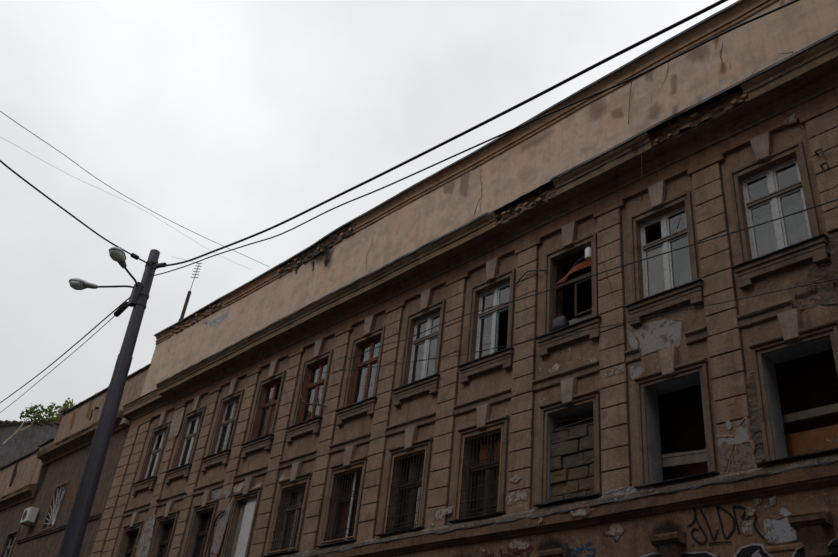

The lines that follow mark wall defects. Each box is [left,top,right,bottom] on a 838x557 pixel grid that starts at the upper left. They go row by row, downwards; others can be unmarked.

peeling [604,317,685,382]
flaking render [716,370,768,474]
peeling [738,496,799,546]